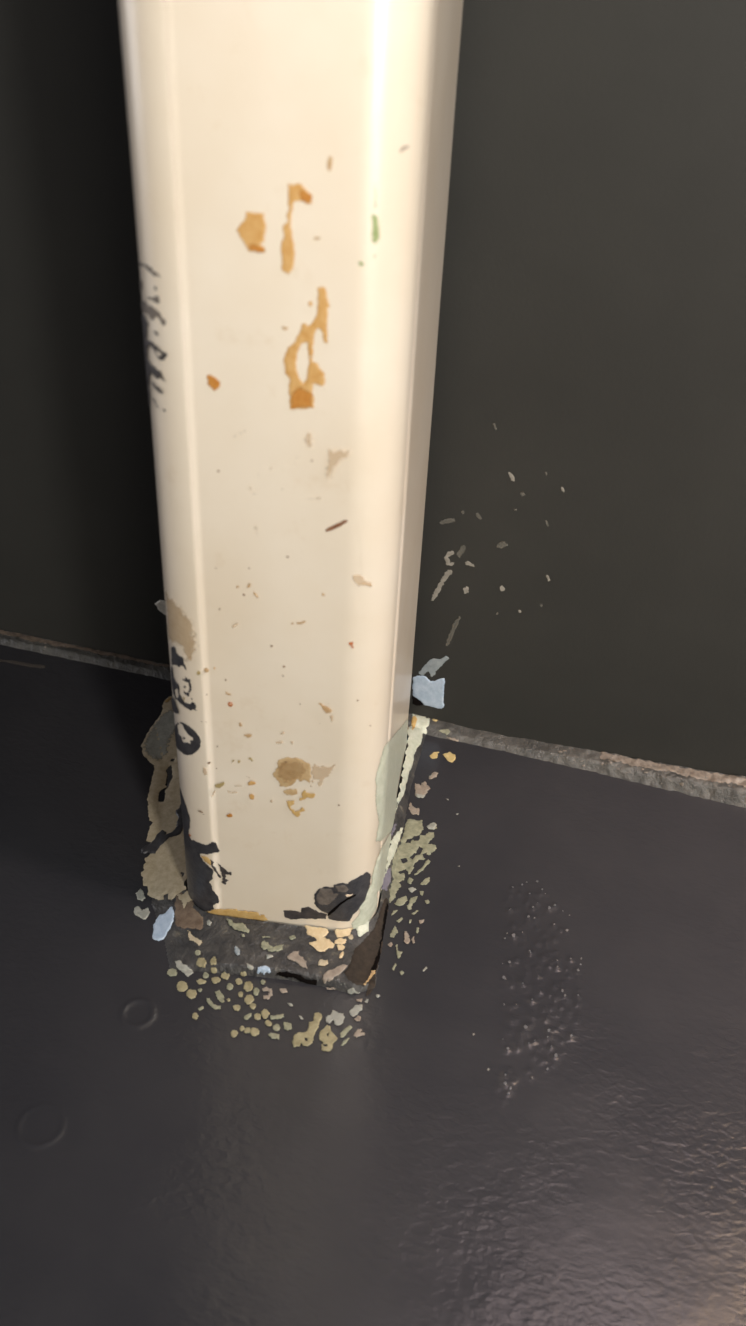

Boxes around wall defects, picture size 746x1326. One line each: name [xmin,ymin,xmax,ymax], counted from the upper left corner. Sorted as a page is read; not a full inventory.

peeling [134,696,190,941]
peeling [388,676,459,975]
peeling [167,919,380,1052]